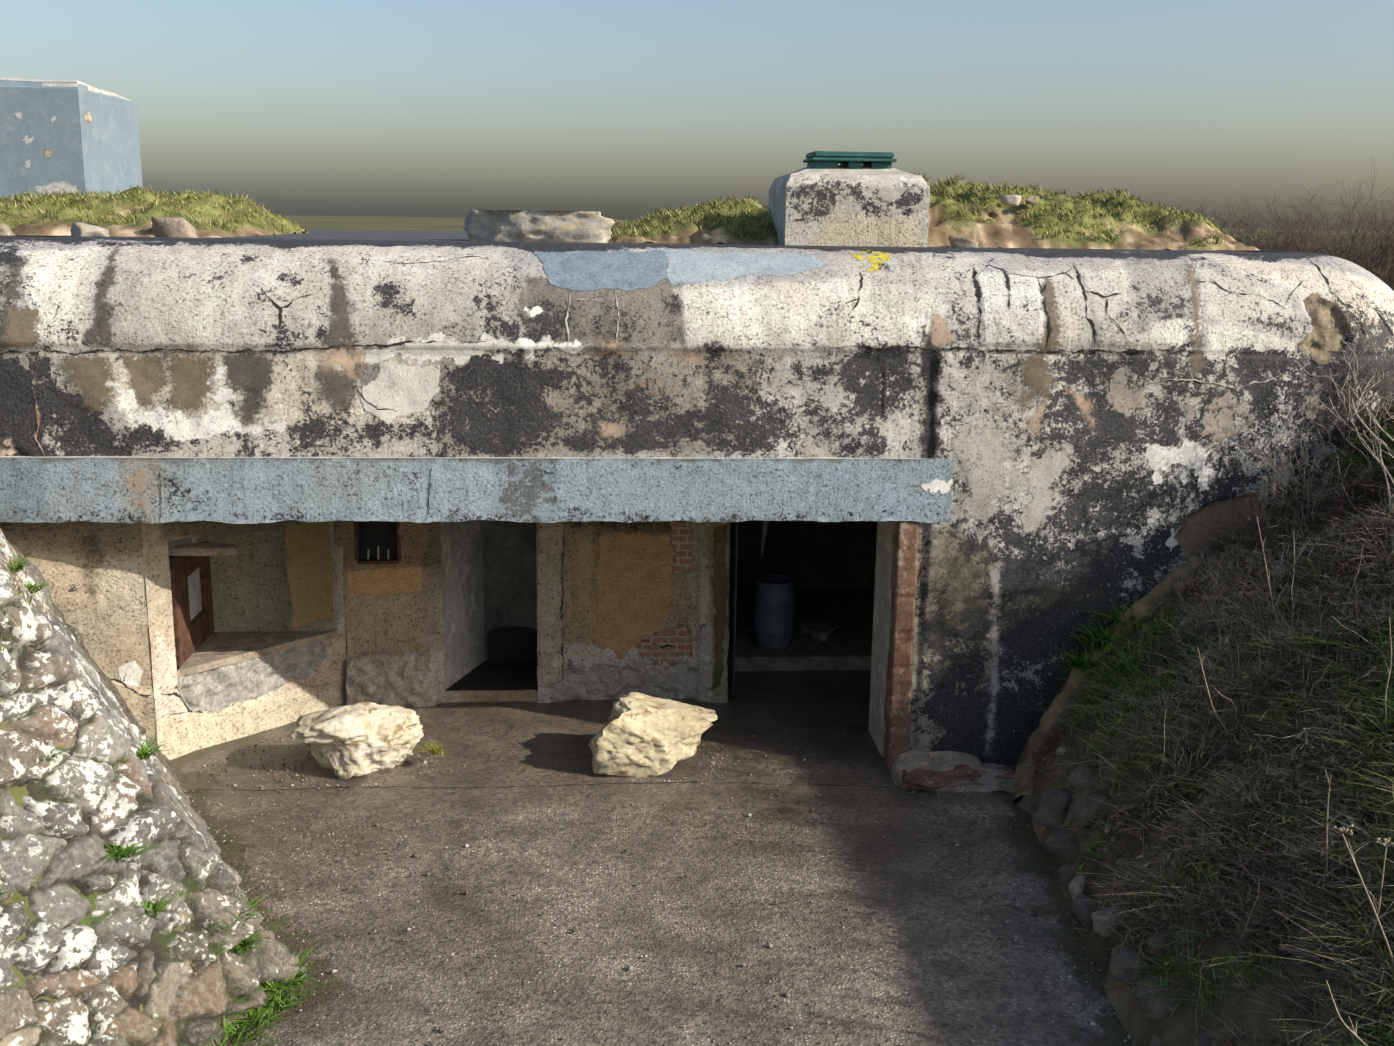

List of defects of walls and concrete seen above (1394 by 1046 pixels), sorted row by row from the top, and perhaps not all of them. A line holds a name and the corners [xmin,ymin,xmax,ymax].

crack [0,288,510,456]
leakage [918,331,945,459]
leakage [1010,278,1062,412]
crack [825,259,1291,415]
peeling [1144,384,1257,502]
crack [1195,259,1394,337]
spalling [1298,292,1352,365]
peeling [1165,525,1181,551]
peeling [545,520,715,703]
leakage [917,537,1110,752]